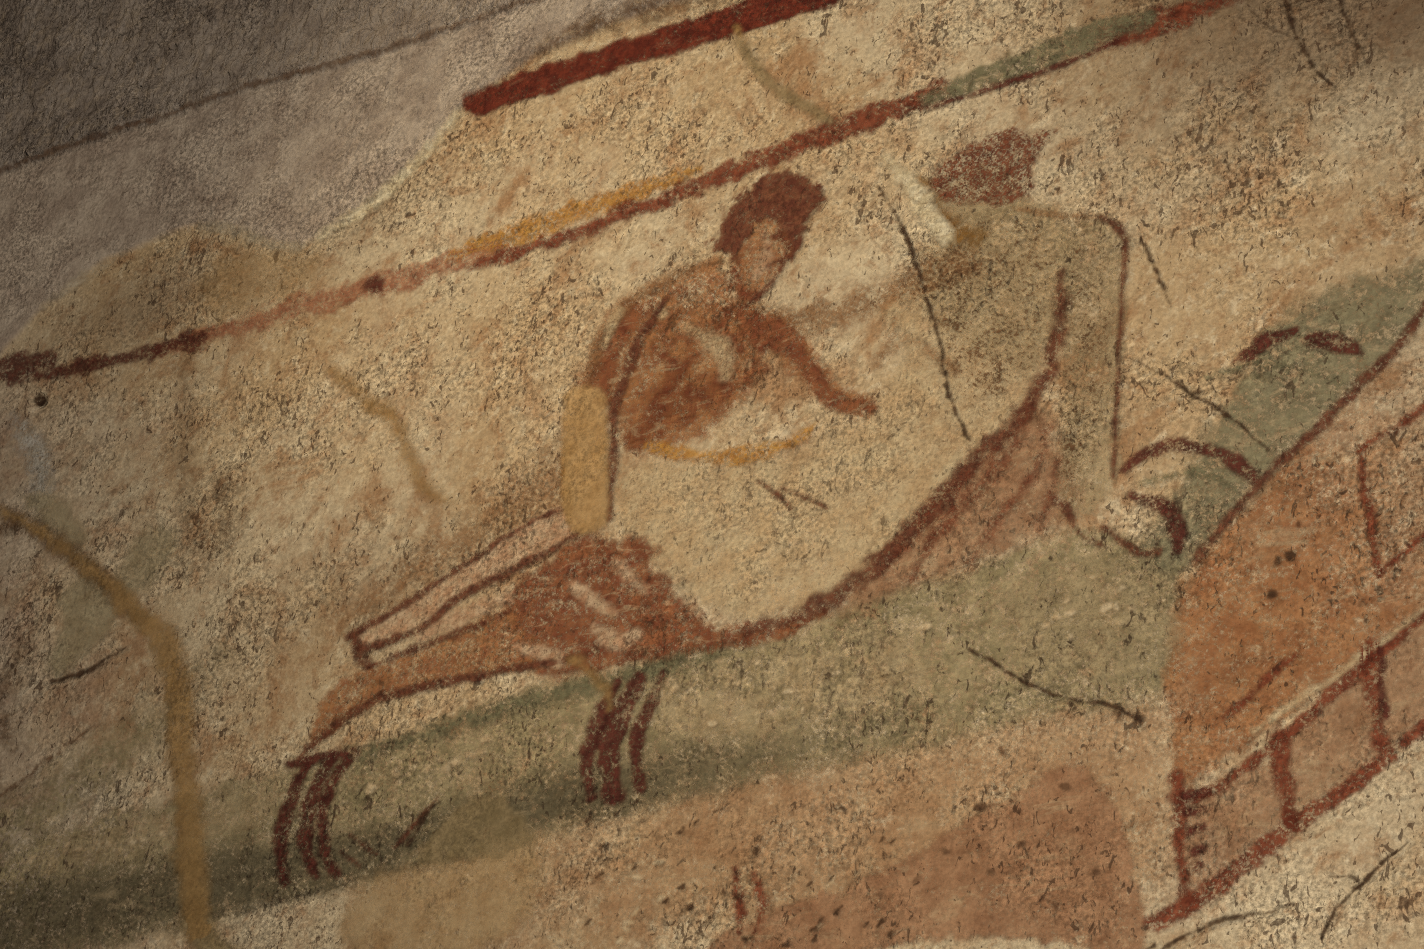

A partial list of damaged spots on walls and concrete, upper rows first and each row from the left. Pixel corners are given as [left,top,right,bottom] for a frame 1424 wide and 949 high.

crack [877,156,977,440]
crack [1161,373,1269,450]
crack [969,648,1133,716]